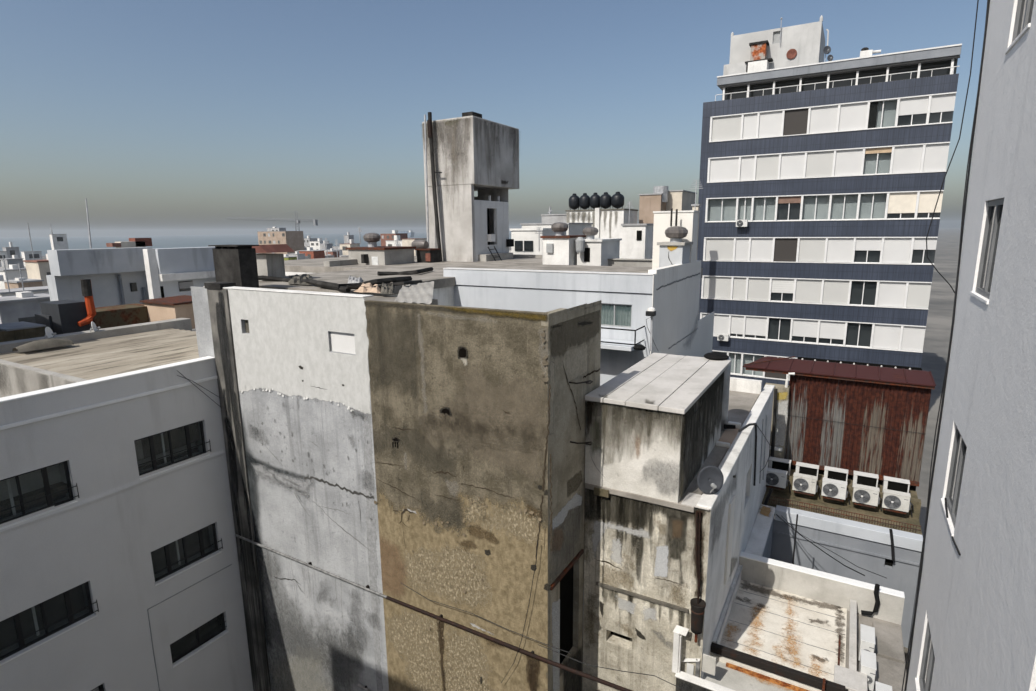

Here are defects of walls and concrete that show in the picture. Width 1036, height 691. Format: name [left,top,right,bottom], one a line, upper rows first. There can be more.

leakage [216,292,360,691]
crack [264,361,600,557]
leakage [368,312,555,533]
leakage [585,372,724,583]
peeling [374,493,548,691]
leakage [603,587,690,627]
rust [774,598,822,676]